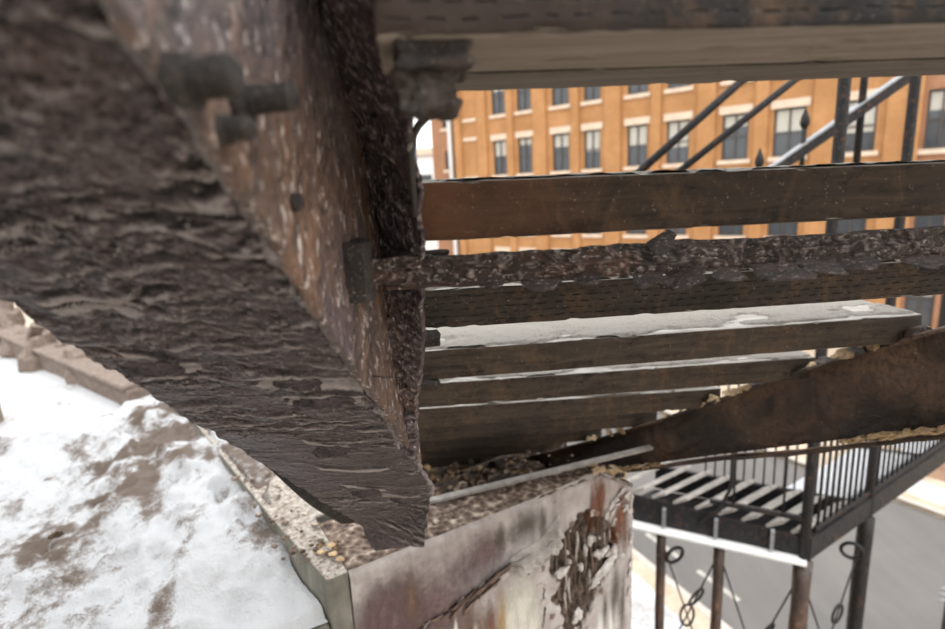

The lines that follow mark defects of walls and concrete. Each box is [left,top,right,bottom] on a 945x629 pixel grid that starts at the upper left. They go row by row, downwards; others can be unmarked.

corrosion [389,67,463,122]
corrosion [806,344,890,367]
corrosion [662,382,767,418]
corrosion [586,428,625,443]
corrosion [839,424,945,444]
corrosion [618,462,661,471]
corrosion [587,484,605,530]
corrosion [611,497,627,544]
spalling [537,488,634,629]
corrosion [377,576,505,629]
crack [417,563,512,629]
crack [539,585,547,629]